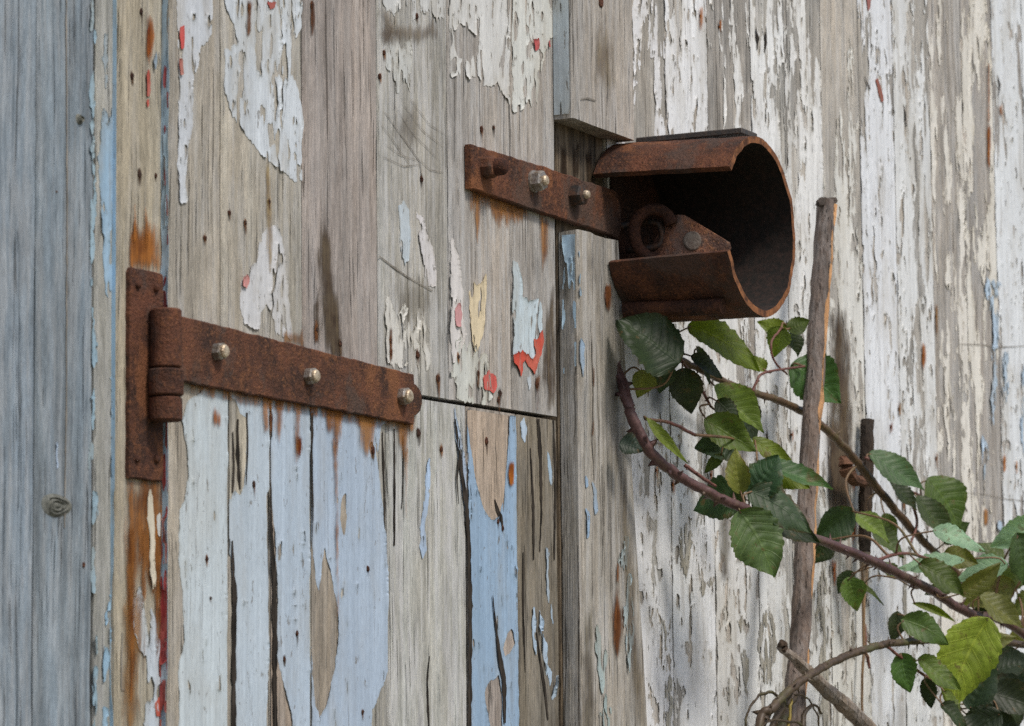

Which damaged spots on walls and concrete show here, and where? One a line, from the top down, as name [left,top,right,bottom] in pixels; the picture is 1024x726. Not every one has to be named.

peeling [382,0,553,113]
peeling [154,0,304,245]
corrosion [130,213,159,271]
peeling [239,225,293,339]
corrosion [285,321,318,345]
corrosion [473,192,525,236]
peeling [512,260,543,359]
peeling [607,0,1024,726]
corrosion [193,385,421,483]
peeling [450,238,527,726]
corrosion [125,480,162,726]
peeling [133,387,389,726]